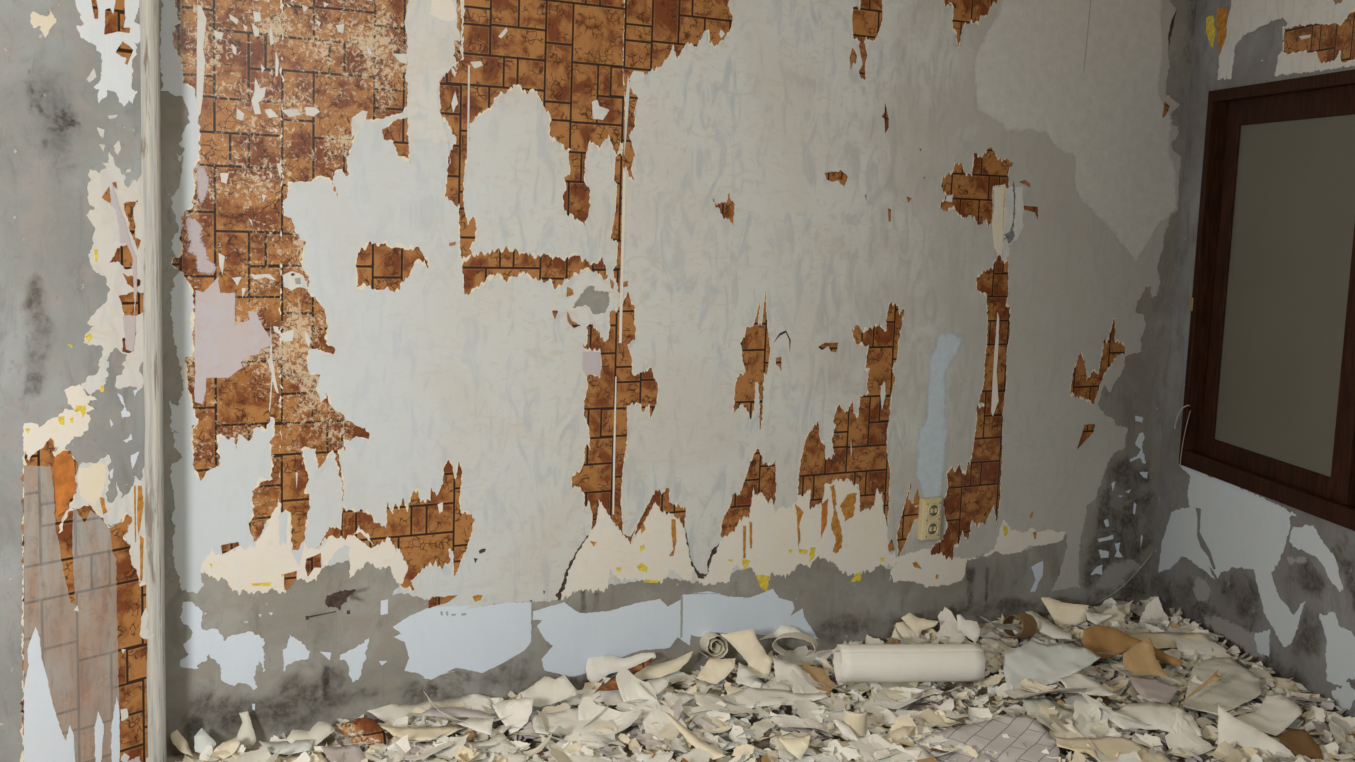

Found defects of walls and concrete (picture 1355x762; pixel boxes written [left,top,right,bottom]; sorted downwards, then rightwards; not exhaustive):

peeling [214,0,320,132]
peeling [351,110,368,138]
peeling [592,100,609,120]
peeling [624,71,646,154]
peeling [218,253,275,298]
spalling [565,271,620,326]
peeling [273,326,311,347]
spalling [306,589,355,620]
peeling [140,608,154,639]
leakage [1165,576,1305,693]
peeling [1254,629,1270,657]
peeling [121,753,153,762]